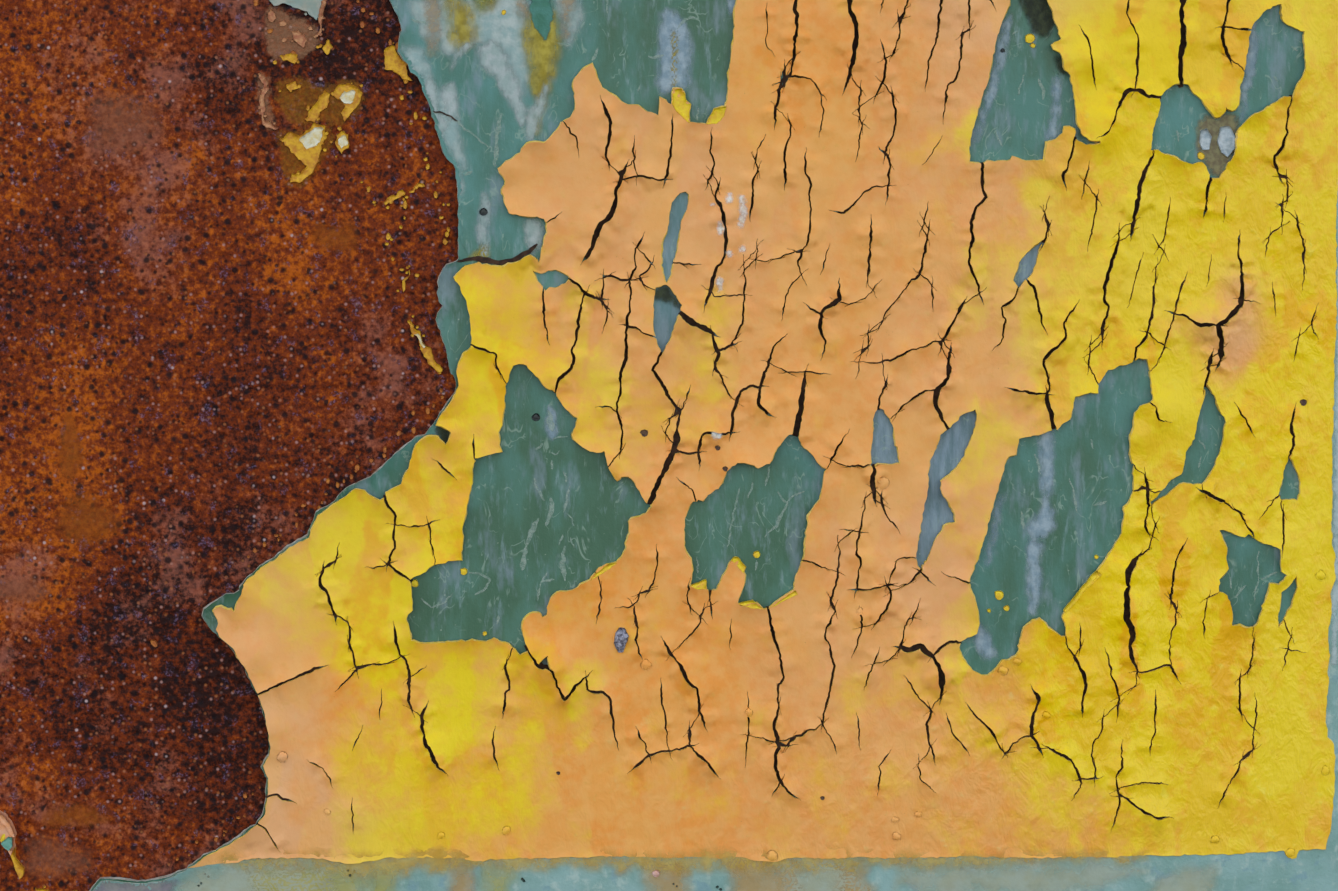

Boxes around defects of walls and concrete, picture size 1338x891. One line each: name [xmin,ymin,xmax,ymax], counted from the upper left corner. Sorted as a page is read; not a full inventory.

rust [426,0,493,48]
peeling [393,0,734,376]
crack [542,0,1306,505]
rust [0,0,459,891]
crack [257,551,442,771]
crack [374,495,436,582]
peeling [406,364,652,655]
crack [492,552,732,773]
peeling [684,434,828,610]
crack [745,437,1217,823]
peeling [959,358,1153,676]
peeling [1219,530,1298,628]